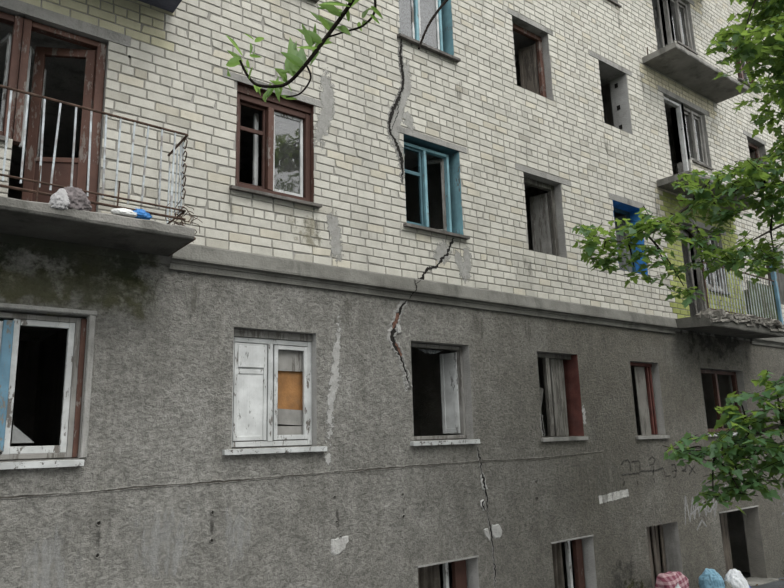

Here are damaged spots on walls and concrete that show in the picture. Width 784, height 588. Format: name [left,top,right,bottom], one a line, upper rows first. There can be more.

crack [387,38,415,182]
water stain [0,267,149,315]
crack [387,238,472,391]
crack [477,447,502,588]